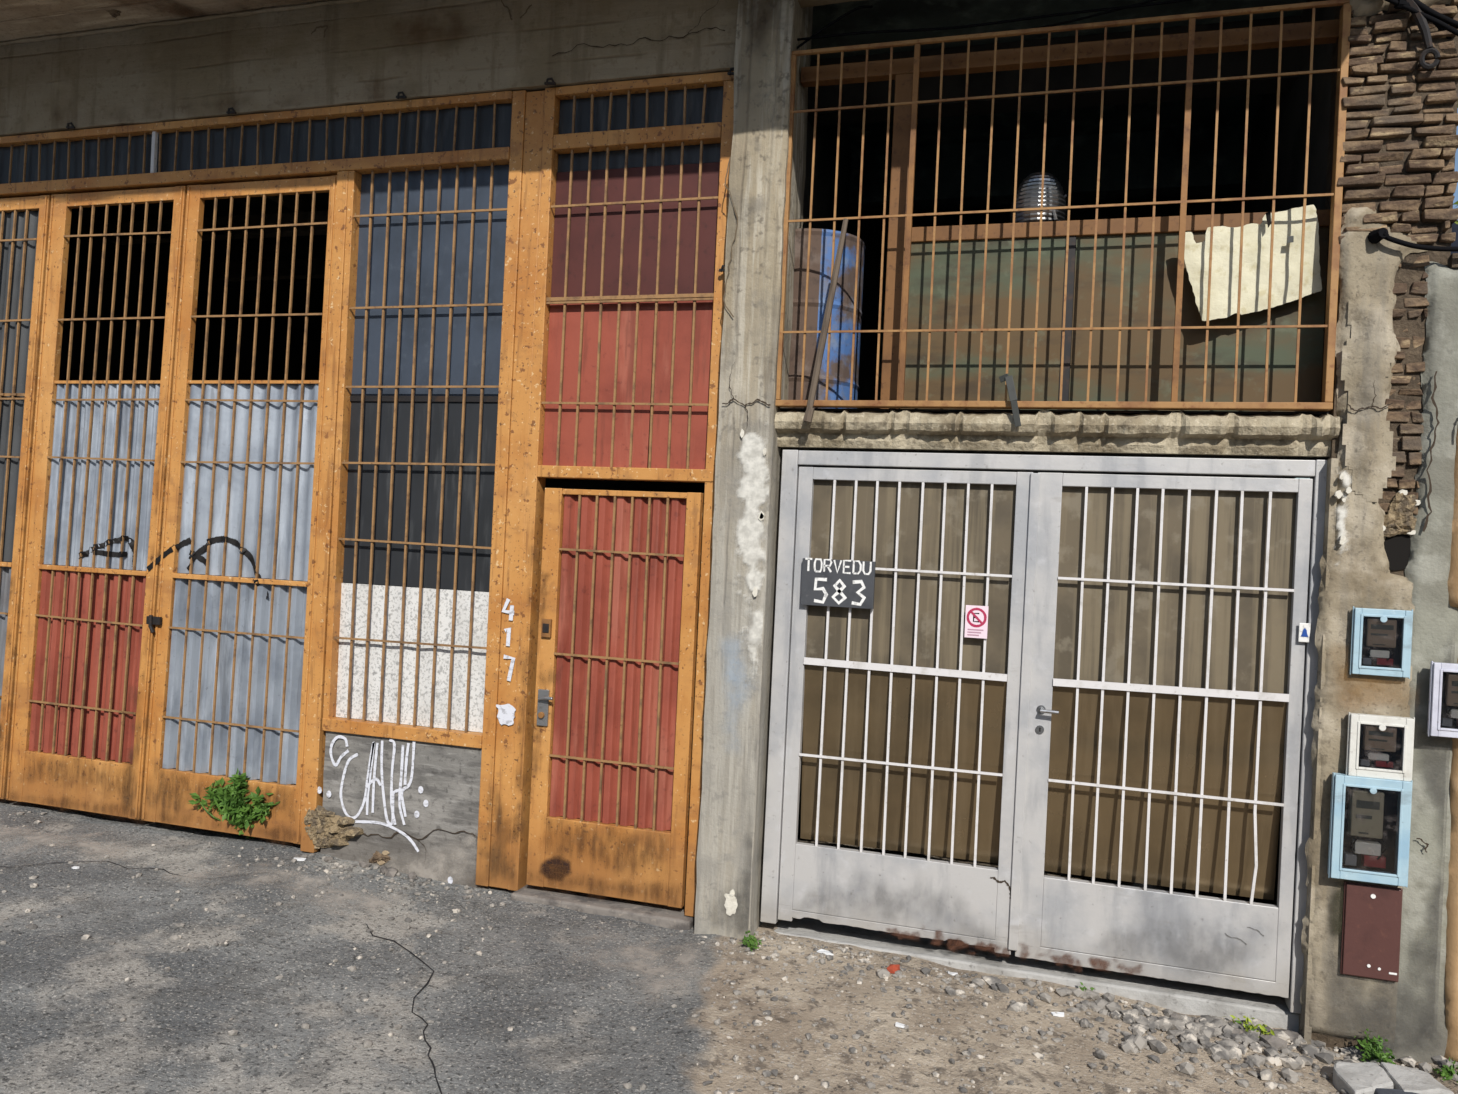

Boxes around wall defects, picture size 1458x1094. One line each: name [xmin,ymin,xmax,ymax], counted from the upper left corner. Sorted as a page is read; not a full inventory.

crack [552,2,725,56]
spalling [1379,255,1430,571]